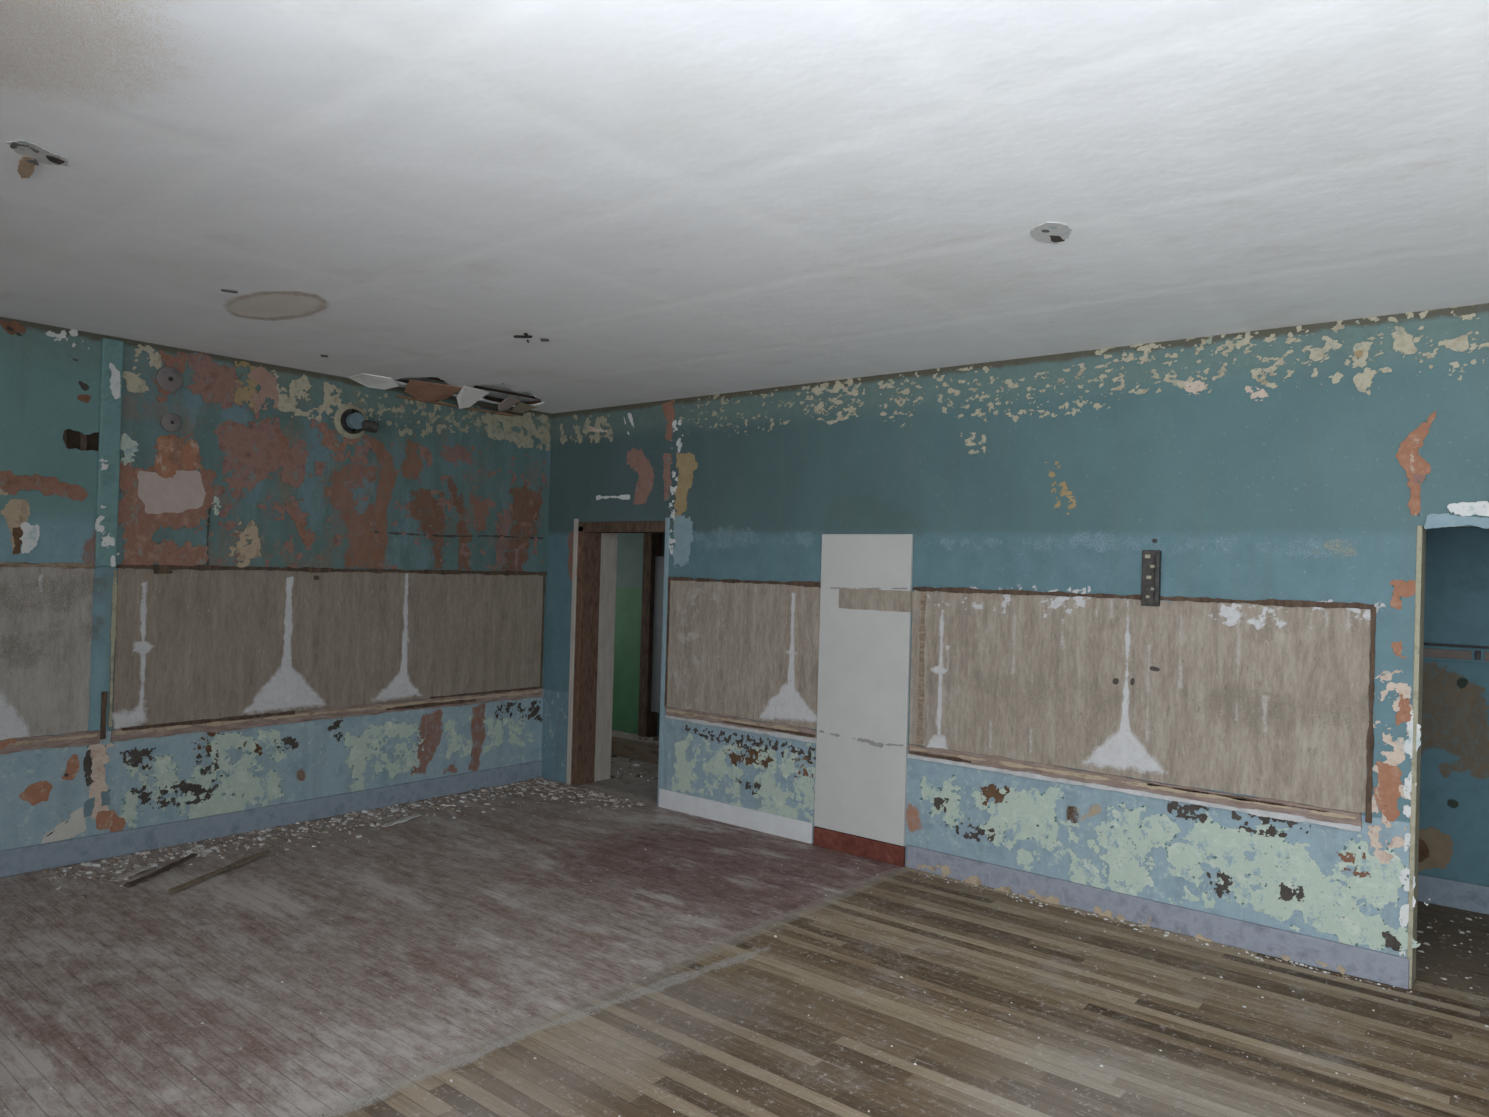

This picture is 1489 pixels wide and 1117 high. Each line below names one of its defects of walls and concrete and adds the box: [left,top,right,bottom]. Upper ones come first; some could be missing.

peeling [0,320,26,336]
spalling [6,140,70,178]
peeling [46,329,89,361]
flaking render [0,344,551,844]
flaking render [626,305,1489,823]
flaking render [906,579,1489,957]